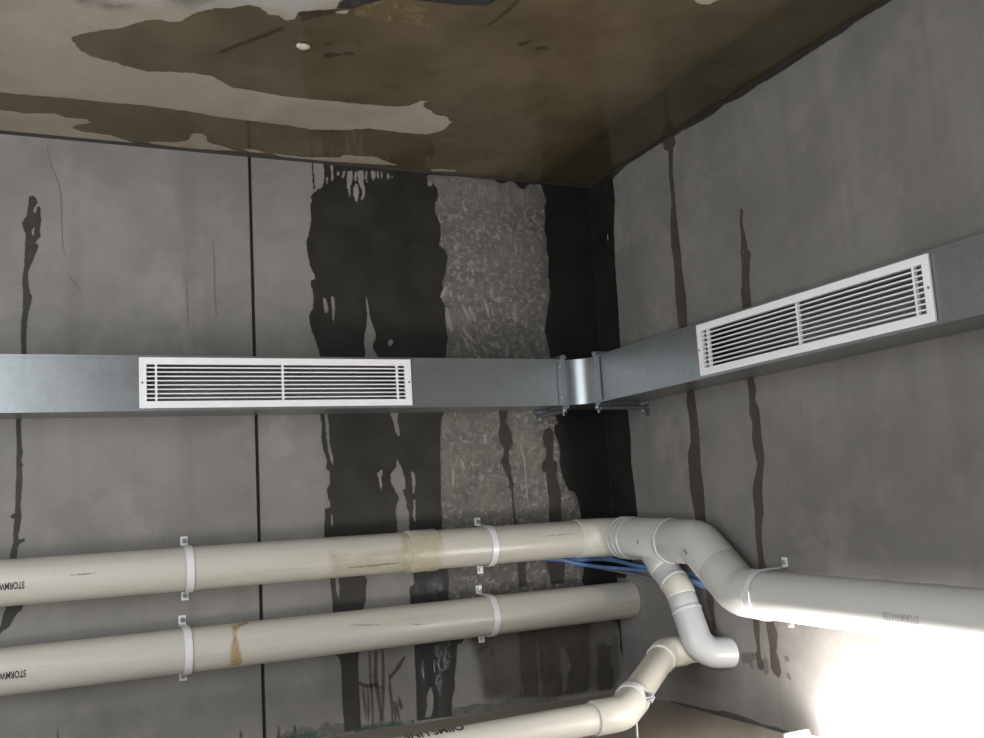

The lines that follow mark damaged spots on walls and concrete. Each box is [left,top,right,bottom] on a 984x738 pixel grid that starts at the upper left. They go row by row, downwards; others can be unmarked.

water stain [306,0,891,360]
water stain [21,196,41,354]
water stain [10,419,25,559]
water stain [320,410,638,537]
water stain [686,390,706,522]
water stain [747,378,766,569]
water stain [0,605,23,634]
water stain [330,576,367,612]
water stain [336,652,378,733]
water stain [706,589,716,630]
water stain [753,619,781,678]